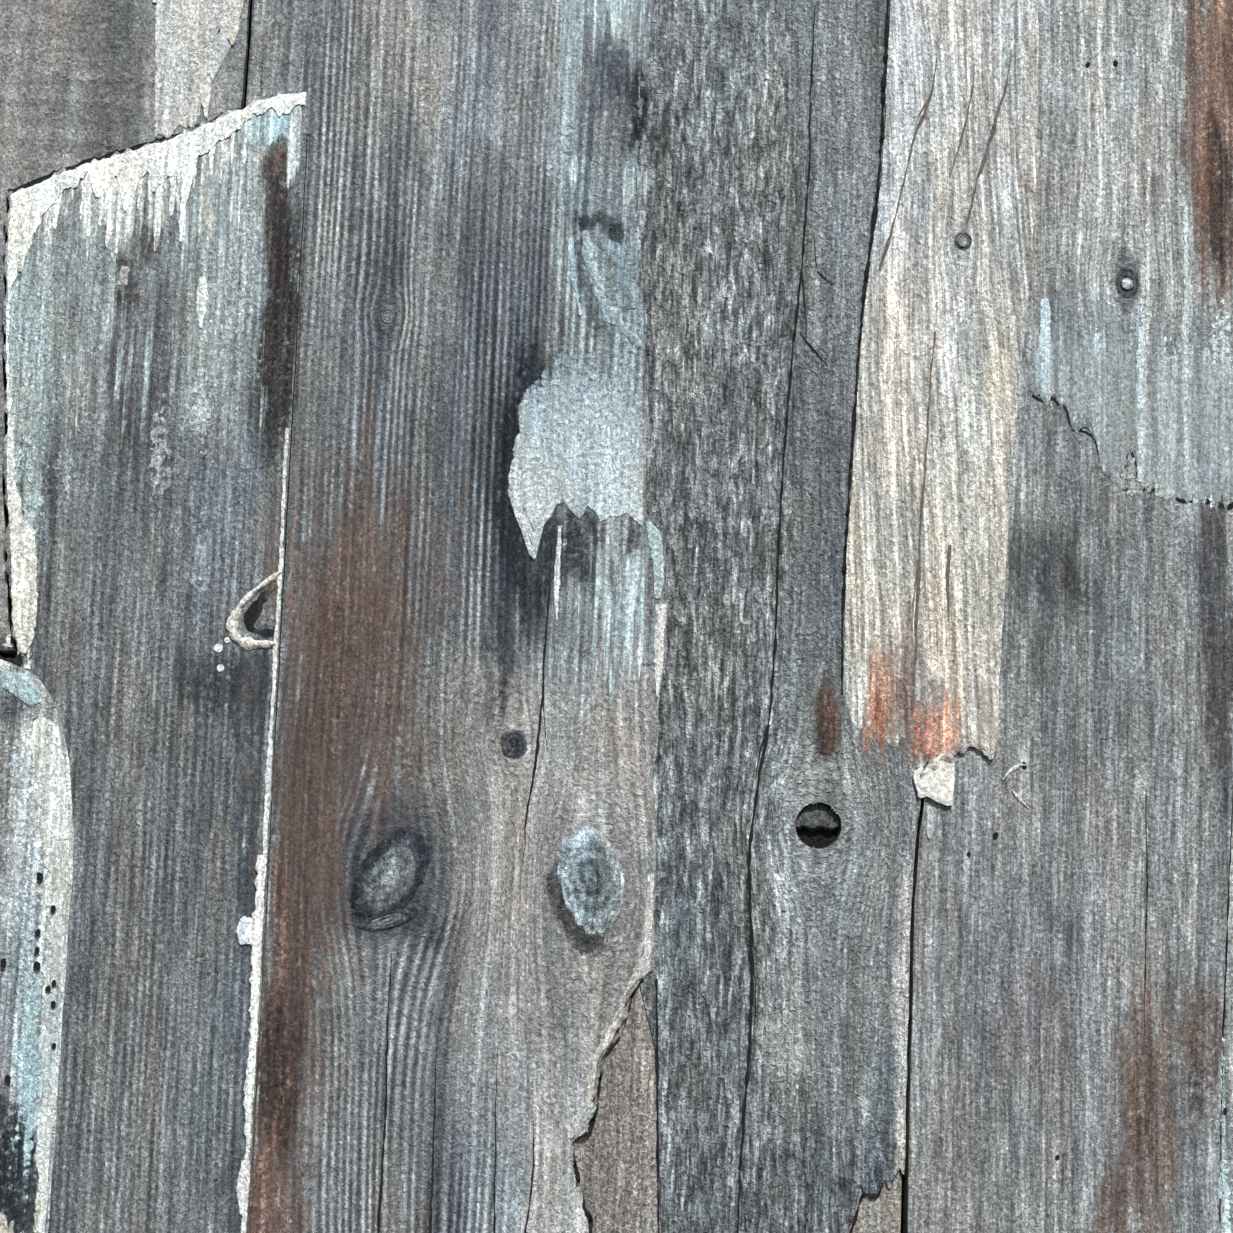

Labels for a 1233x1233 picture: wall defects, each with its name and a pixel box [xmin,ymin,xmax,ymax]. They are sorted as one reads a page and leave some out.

peeling [559,215,642,347]
rust [1181,0,1233,303]
peeling [0,0,307,1233]
crack [523,545,552,858]
peeling [508,337,667,705]
rust [815,681,841,755]
crack [737,0,937,1233]
rust [863,643,993,762]
crack [911,331,952,714]
peeling [913,753,955,839]
peeling [570,873,654,1139]
crack [573,979,660,1233]